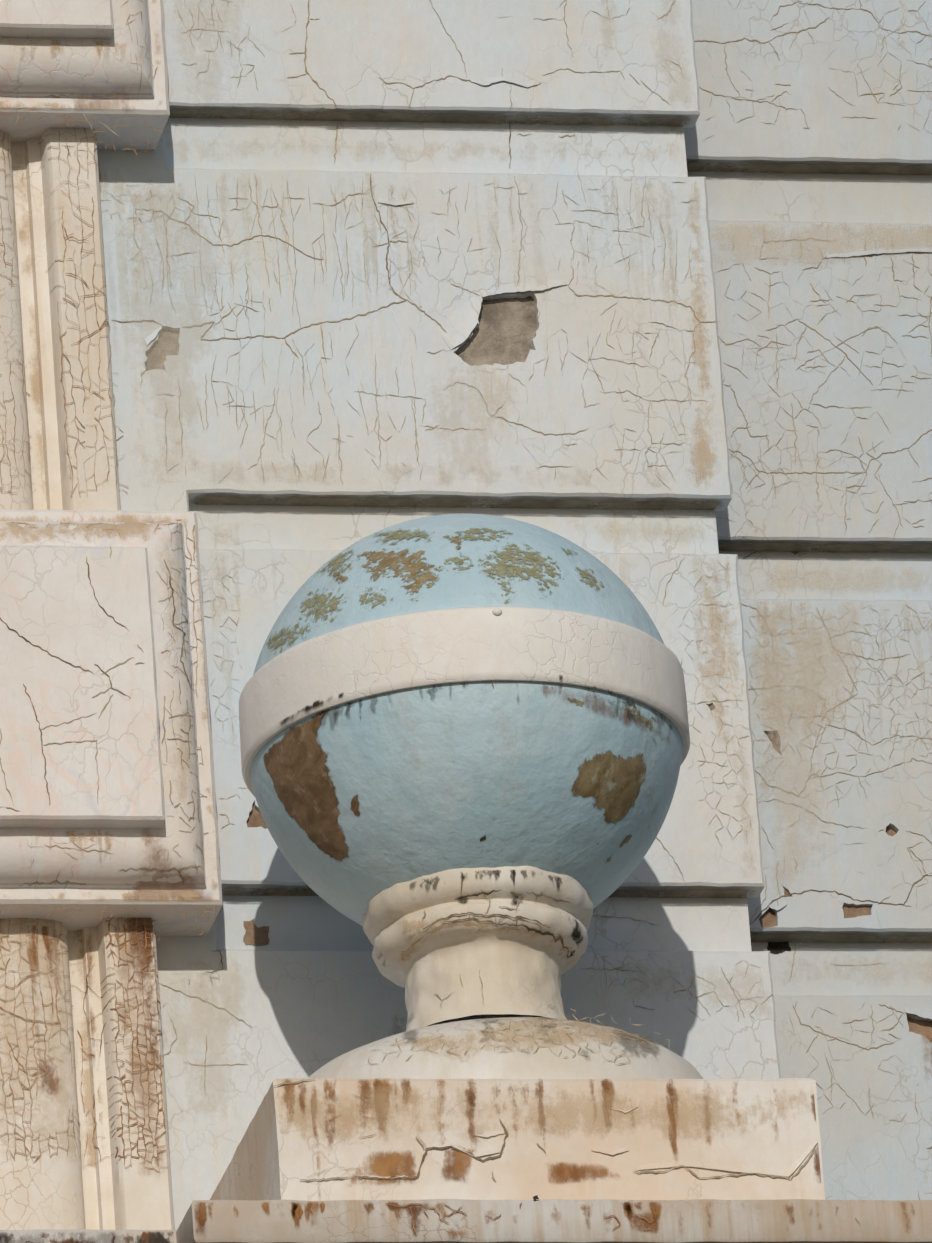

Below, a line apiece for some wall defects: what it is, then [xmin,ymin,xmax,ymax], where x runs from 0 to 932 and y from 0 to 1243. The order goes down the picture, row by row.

spalling [439,279,569,366]
spalling [141,325,179,371]
crack [663,551,932,925]
spalling [246,802,266,829]
crack [0,519,251,1172]
spalling [904,1007,932,1043]
crack [300,890,932,1233]
rust [353,1152,415,1183]
rust [443,1150,471,1180]
rust [550,1163,607,1182]
rust [388,1203,423,1234]
water stain [138,1232,168,1243]